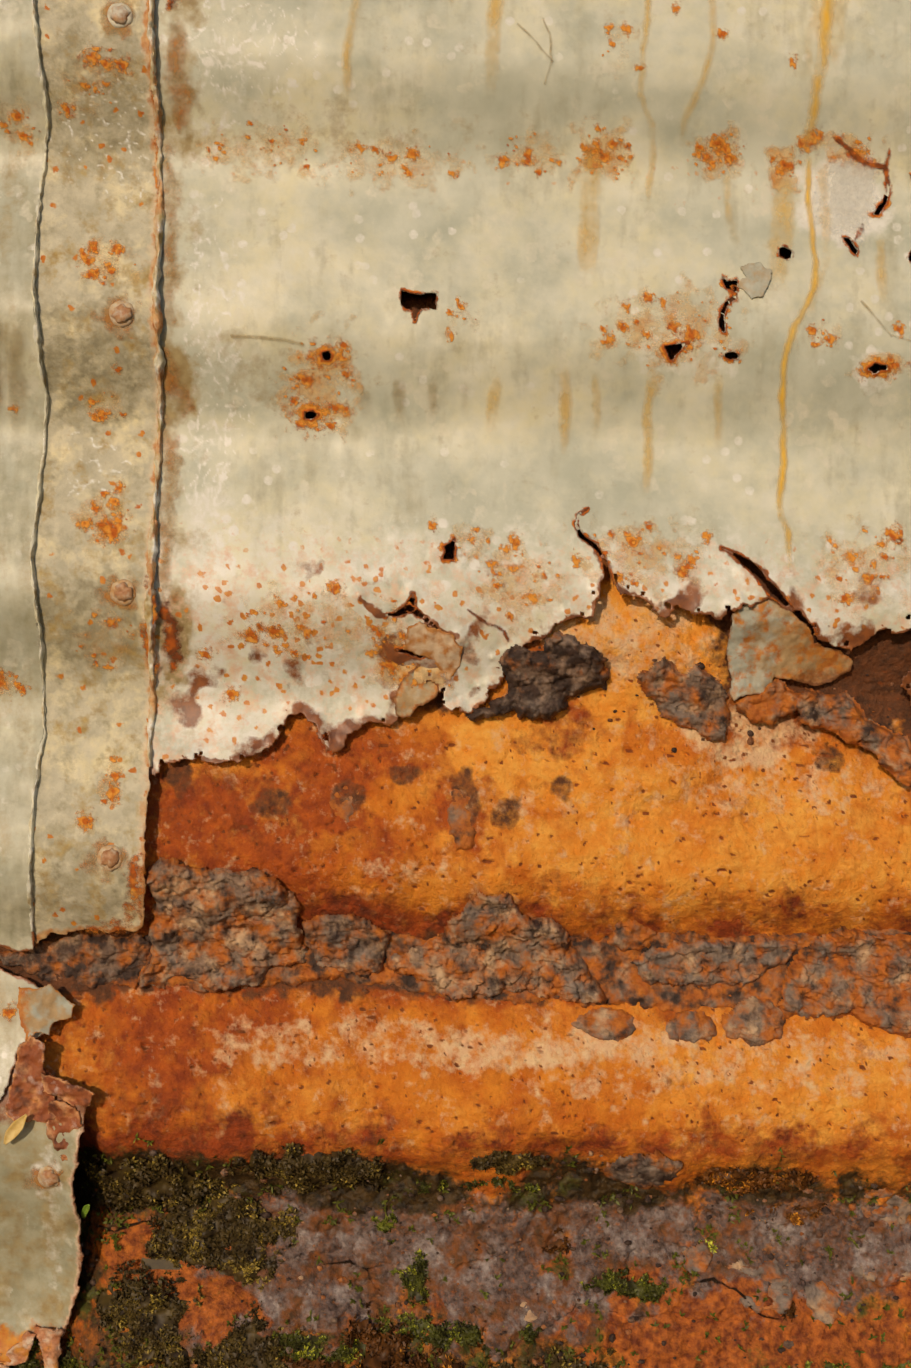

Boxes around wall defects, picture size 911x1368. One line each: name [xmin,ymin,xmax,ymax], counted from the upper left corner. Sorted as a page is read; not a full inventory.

leakage [810,0,833,127]
leakage [777,163,818,506]
rust [92,525,211,676]
rust [238,580,450,687]
peeling [393,621,463,718]
rust [466,631,610,722]
rust [637,656,911,787]
peeling [726,600,853,701]
peeling [17,984,75,1041]
rust [0,851,911,1047]
rust [5,1035,95,1188]
rust [682,1241,842,1325]